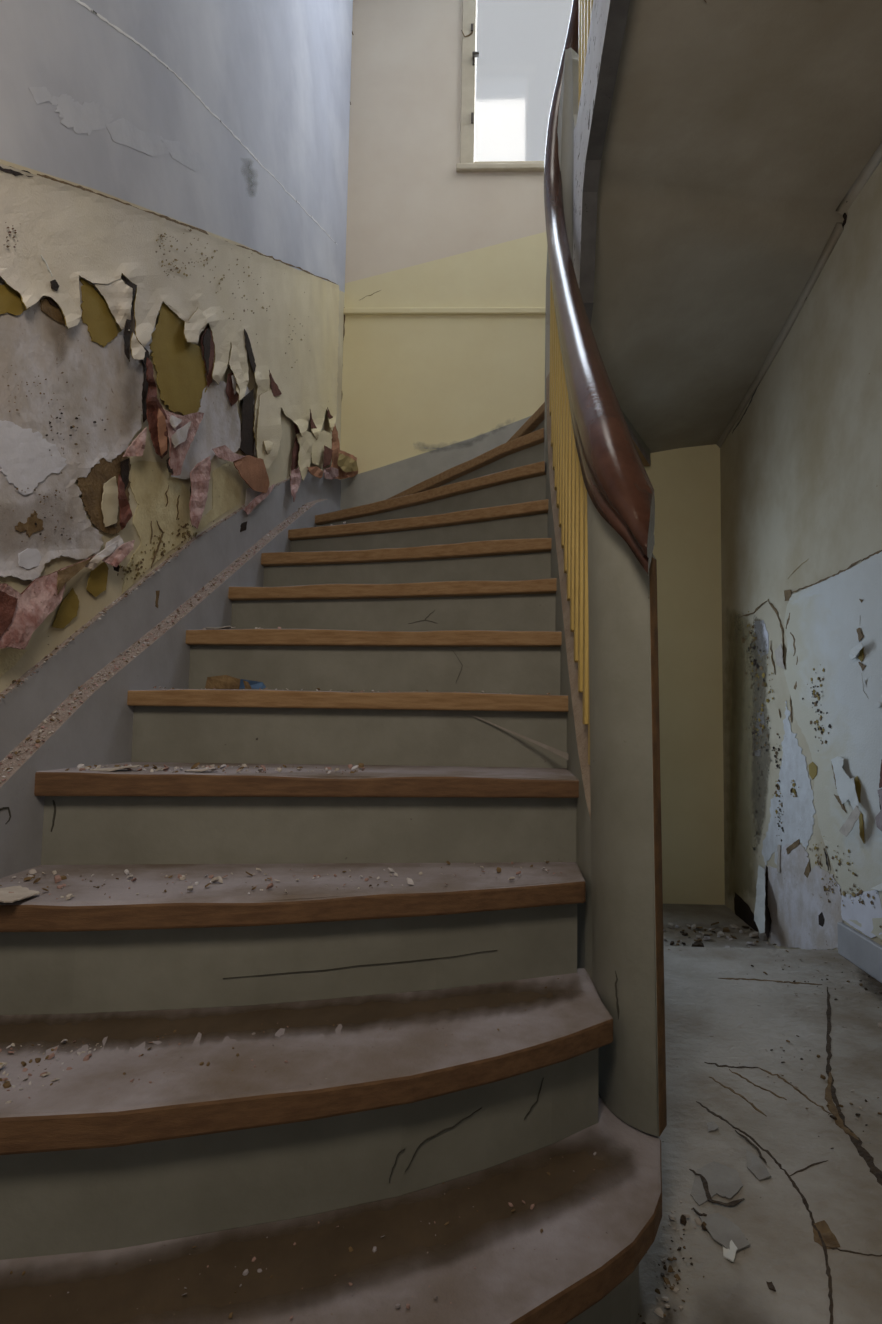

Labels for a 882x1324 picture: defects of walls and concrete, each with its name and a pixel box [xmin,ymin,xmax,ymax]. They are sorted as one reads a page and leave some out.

peeling [0,164,358,649]
peeling [0,886,40,903]
peeling [734,552,882,950]
crack [389,1107,482,1183]
crack [696,978,882,1324]